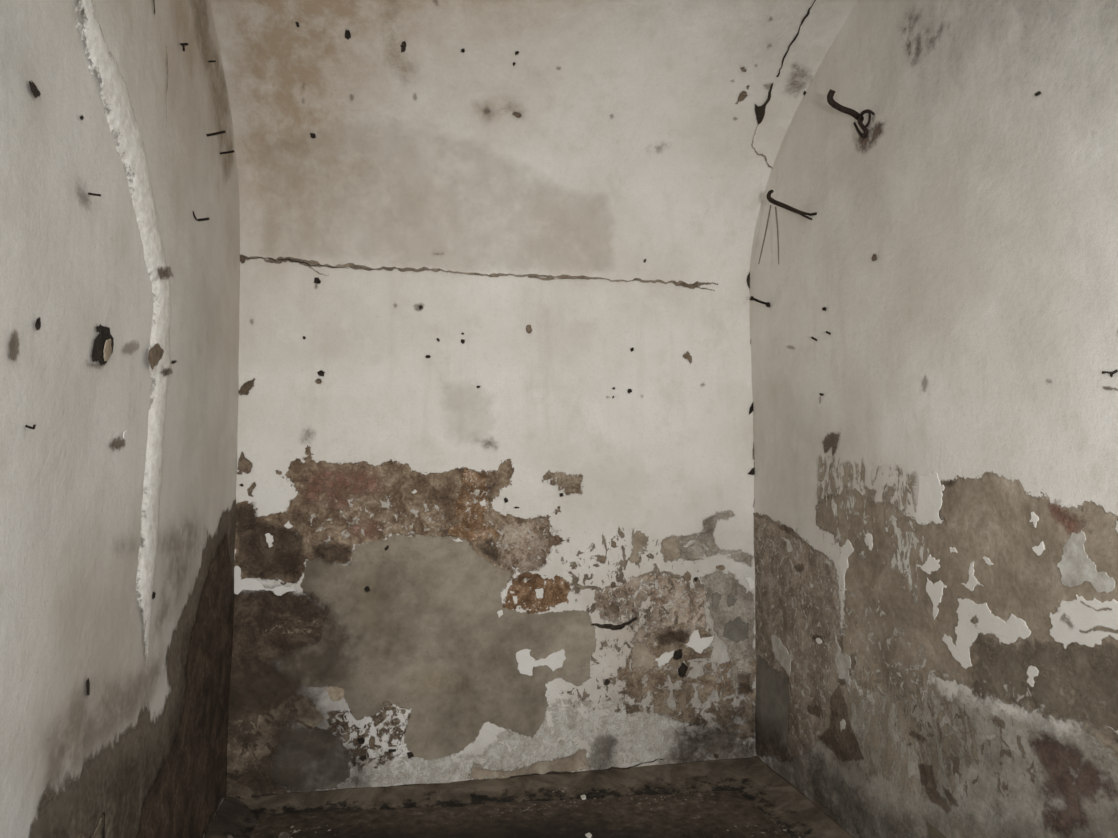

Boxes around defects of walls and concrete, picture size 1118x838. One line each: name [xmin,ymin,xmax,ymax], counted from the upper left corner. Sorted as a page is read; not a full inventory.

crack [752,0,816,169]
crack [240,255,718,290]
leakage [29,500,345,838]
flaking render [226,433,1118,838]
leakage [352,699,1118,838]